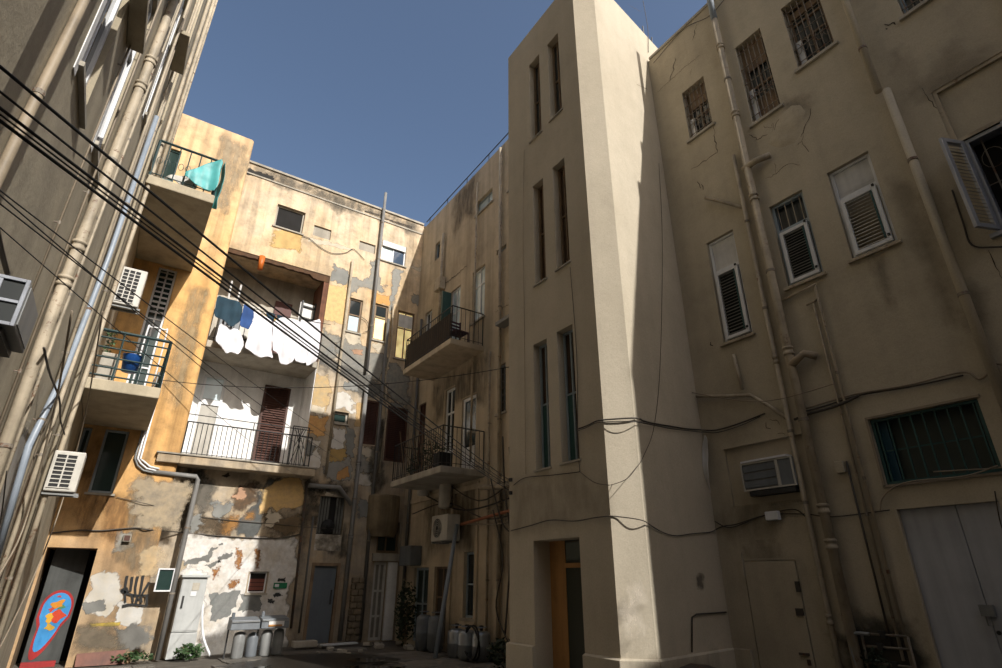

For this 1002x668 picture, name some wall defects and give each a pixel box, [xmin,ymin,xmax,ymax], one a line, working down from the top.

peeling [269,230,352,253]
peeling [303,260,421,486]
peeling [82,570,154,651]
peeling [112,477,305,656]